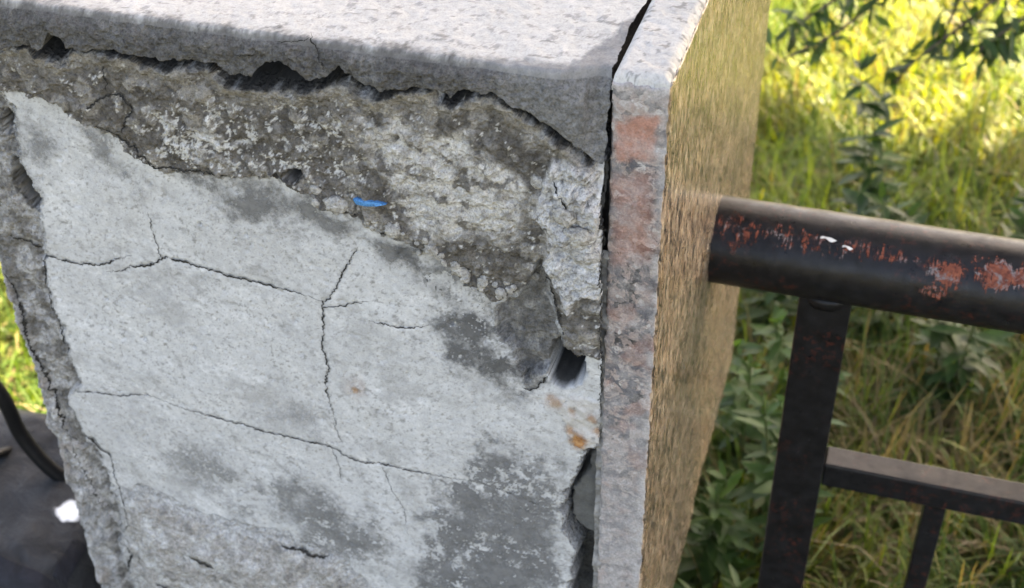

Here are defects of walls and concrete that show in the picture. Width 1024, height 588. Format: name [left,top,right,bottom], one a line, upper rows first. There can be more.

crack [3,221,543,571]
spalling [0,39,602,588]
crack [524,267,564,391]
corrosion [568,428,586,449]
crack [588,152,611,443]
corrosion [712,212,1024,300]